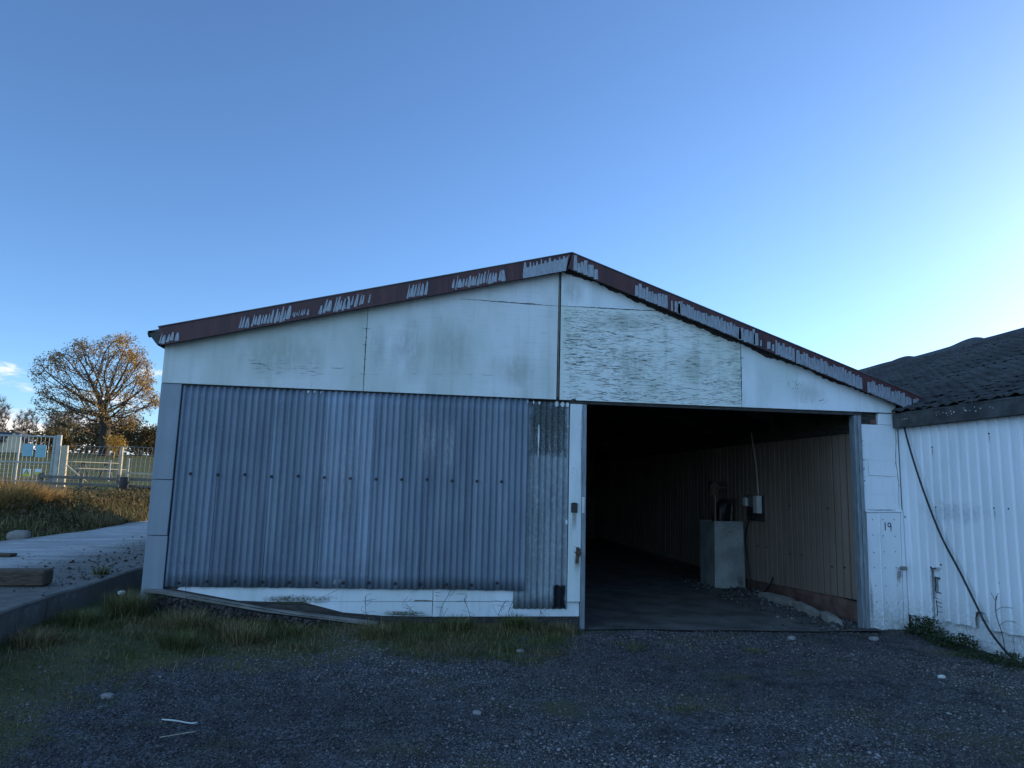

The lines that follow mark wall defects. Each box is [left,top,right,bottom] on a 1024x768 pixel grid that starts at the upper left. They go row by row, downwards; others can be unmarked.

peeling [407,281,428,299]
peeling [452,270,506,290]
peeling [239,294,371,328]
peeling [159,332,179,344]
peeling [523,255,924,410]
damp [531,403,566,504]
damp [552,585,565,609]